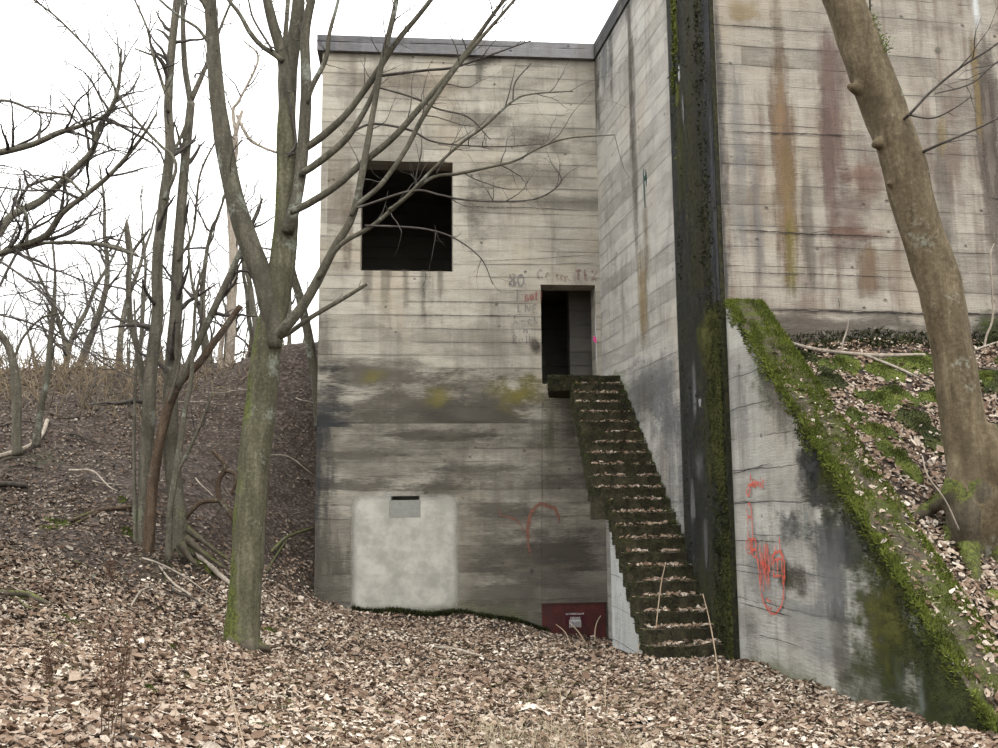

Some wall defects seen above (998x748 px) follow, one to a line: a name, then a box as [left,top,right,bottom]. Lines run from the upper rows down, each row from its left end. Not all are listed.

water stain [626,2,634,107]
corrosion [769,51,798,286]
corrosion [820,38,881,294]
water stain [315,362,526,527]
water stain [796,444,832,507]
water stain [467,536,595,587]
water stain [779,513,862,623]